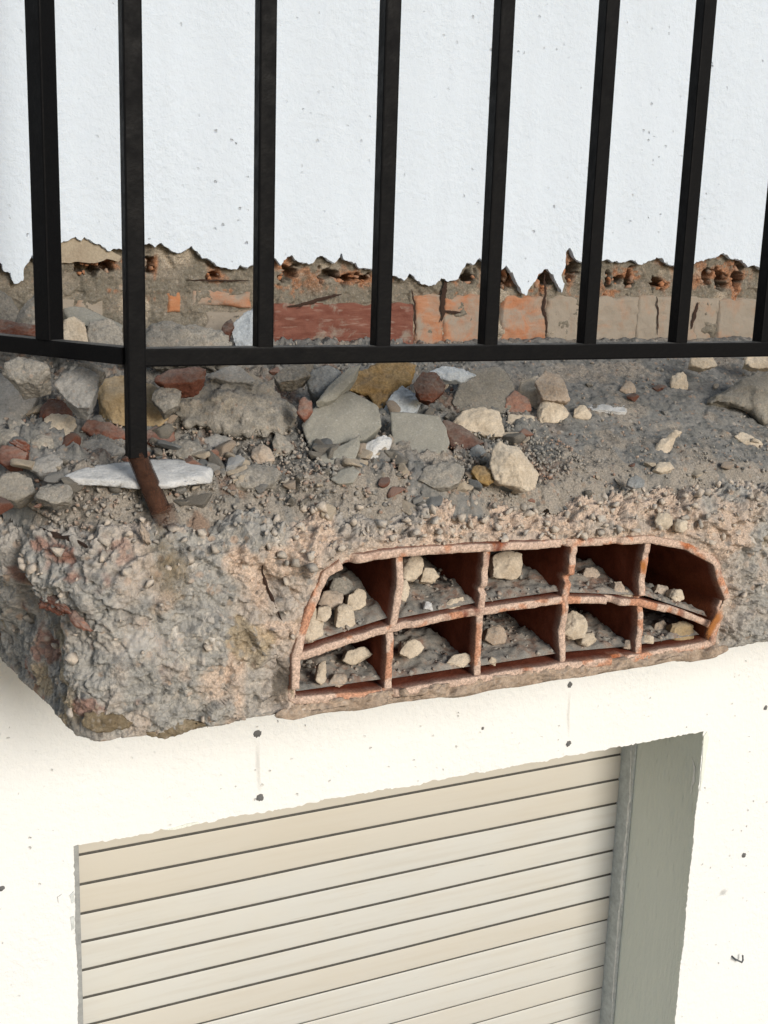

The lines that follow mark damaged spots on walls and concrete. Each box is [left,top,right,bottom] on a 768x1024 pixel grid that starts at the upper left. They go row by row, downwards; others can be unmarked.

spalling [0,256,34,312]
spalling [61,237,123,339]
spalling [145,243,253,336]
spalling [273,256,372,342]
spalling [390,260,481,344]
spalling [498,250,581,340]
spalling [597,258,674,340]
spalling [687,254,759,340]
corrosion [127,453,174,519]
spalling [0,430,768,742]